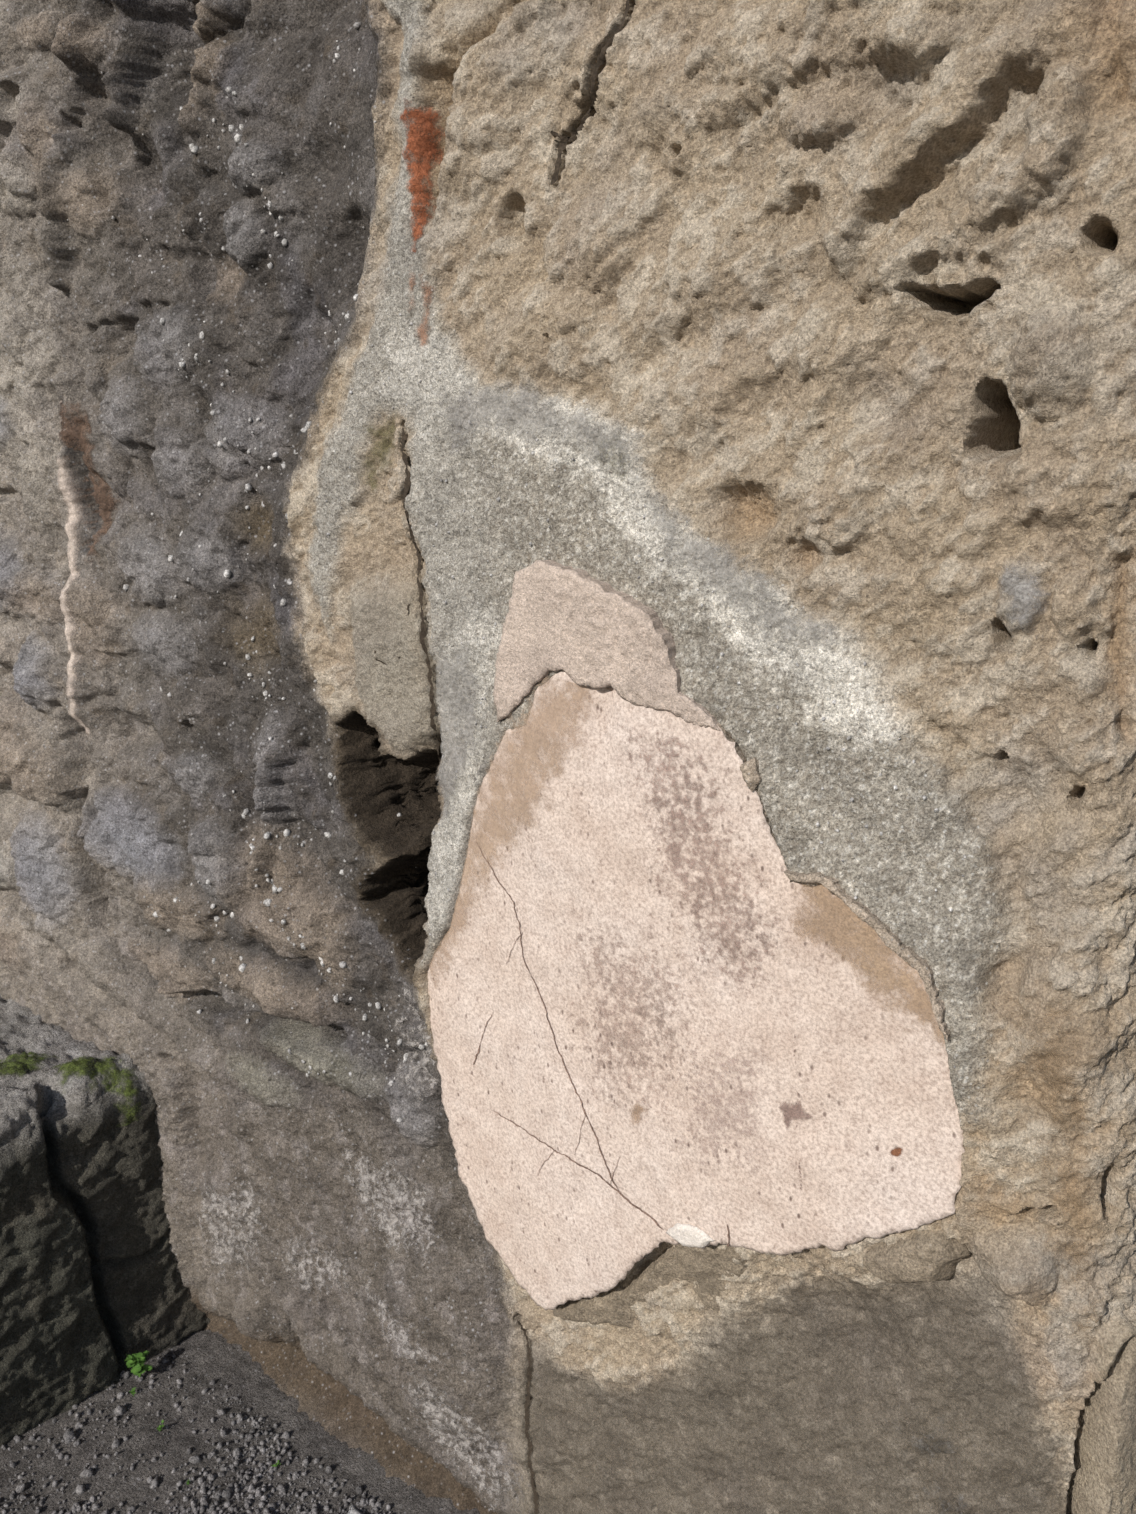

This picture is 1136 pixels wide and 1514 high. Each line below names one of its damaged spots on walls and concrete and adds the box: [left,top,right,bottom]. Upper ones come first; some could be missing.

crack [550,0,630,185]
crack [374,427,440,761]
spalling [306,0,1013,1128]
crack [476,842,663,1230]
crack [517,1317,541,1514]